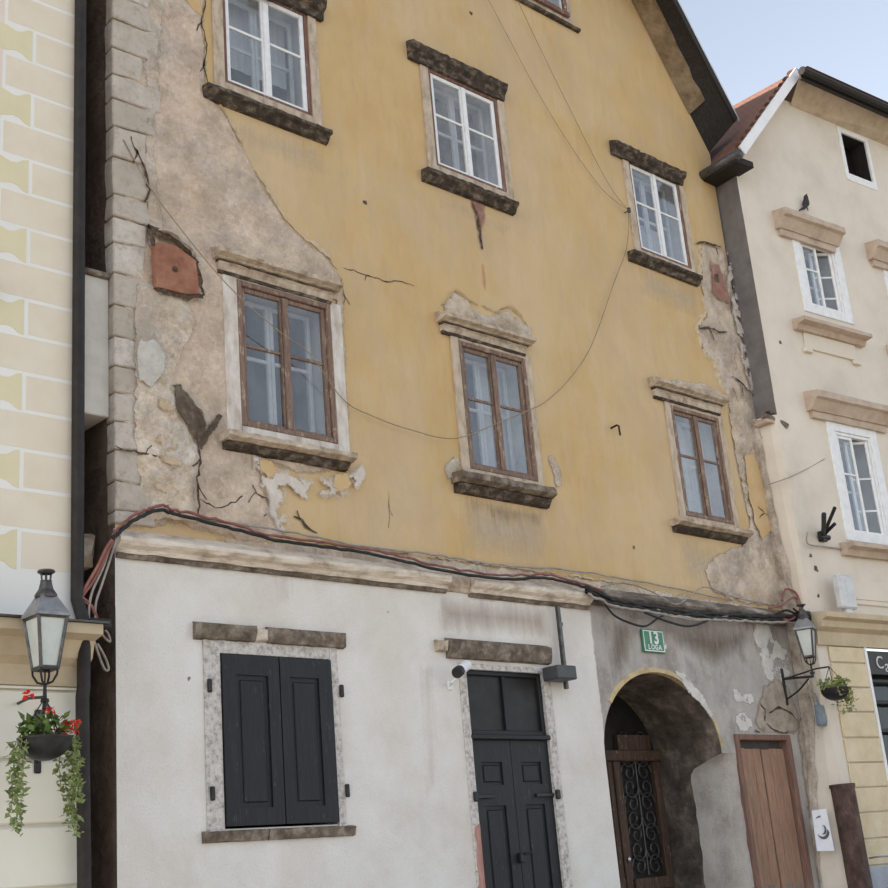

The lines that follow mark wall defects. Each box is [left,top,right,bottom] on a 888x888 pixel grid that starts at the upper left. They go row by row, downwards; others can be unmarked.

crack [197,0,208,82]
corrosion [472,201,485,249]
crack [341,268,414,305]
peeling [121,0,783,608]
crack [192,432,270,516]
spalling [733,623,811,816]